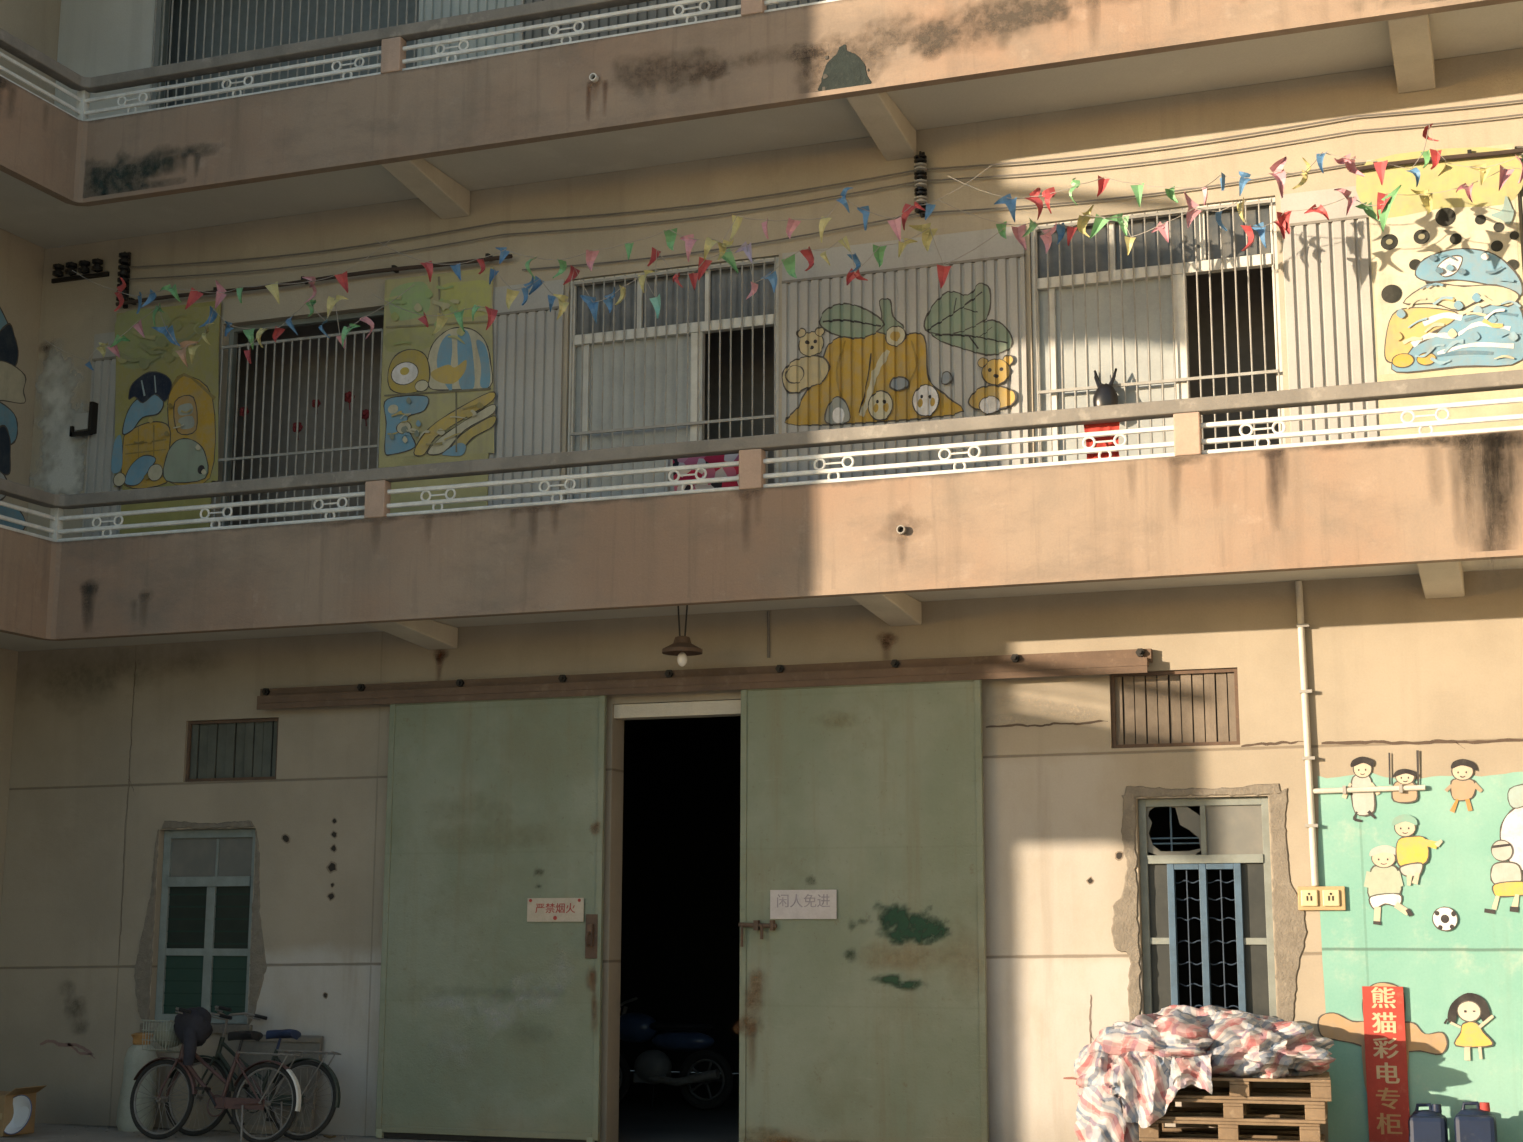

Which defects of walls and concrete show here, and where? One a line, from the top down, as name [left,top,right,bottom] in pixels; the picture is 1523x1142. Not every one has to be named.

leakage [885,0,1067,54]
leakage [85,149,195,196]
leakage [1367,432,1520,551]
crack [1241,738,1523,747]
peeling [879,905,948,944]
peeling [880,975,920,989]